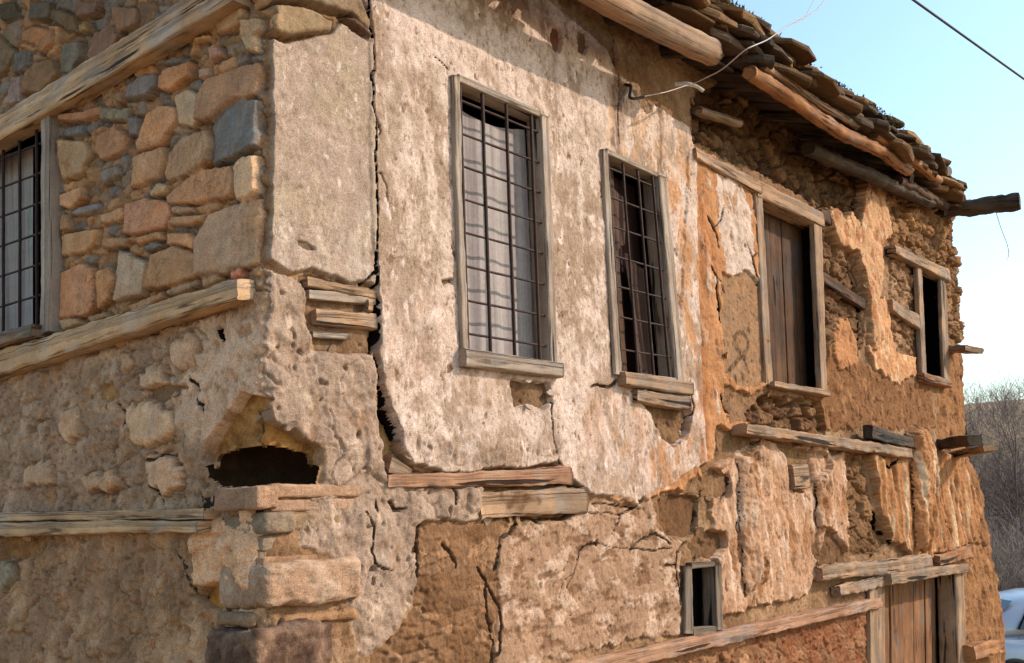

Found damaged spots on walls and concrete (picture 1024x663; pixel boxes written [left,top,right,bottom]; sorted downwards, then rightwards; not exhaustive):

crack [358,0,396,441]
crack [707,211,724,321]
spalling [822,228,866,347]
spalling [202,395,319,508]
spalling [480,484,566,492]
spalling [509,378,556,410]
spalling [645,406,685,447]
spalling [657,271,821,559]
spalling [370,514,564,663]
crack [365,474,730,663]